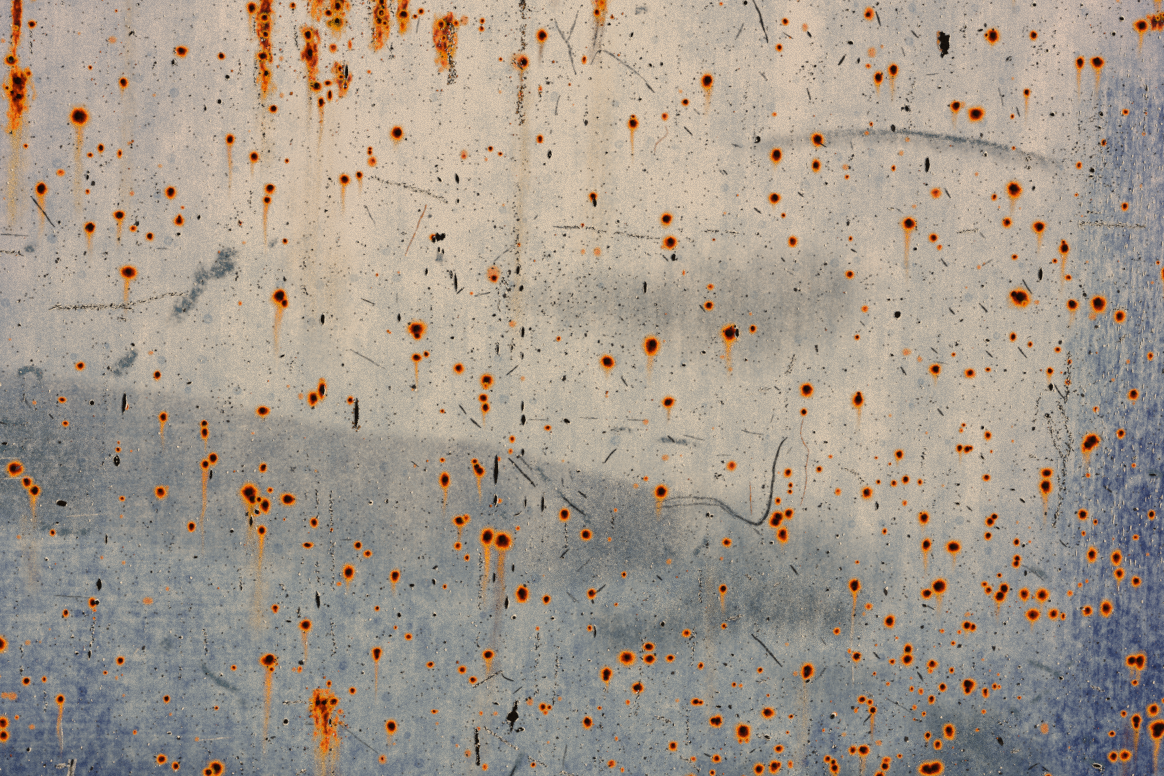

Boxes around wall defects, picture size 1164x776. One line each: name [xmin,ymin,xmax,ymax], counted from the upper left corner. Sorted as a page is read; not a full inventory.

corrosion [2,0,36,149]
corrosion [246,0,283,113]
corrosion [69,107,132,158]
corrosion [1009,288,1039,307]
corrosion [408,322,429,390]
corrosion [643,336,665,358]
corrosion [241,463,295,557]
corrosion [481,526,520,574]
corrosion [921,578,947,600]
corrosion [309,680,356,753]
corrosion [919,724,955,776]
corrosion [1109,698,1164,762]